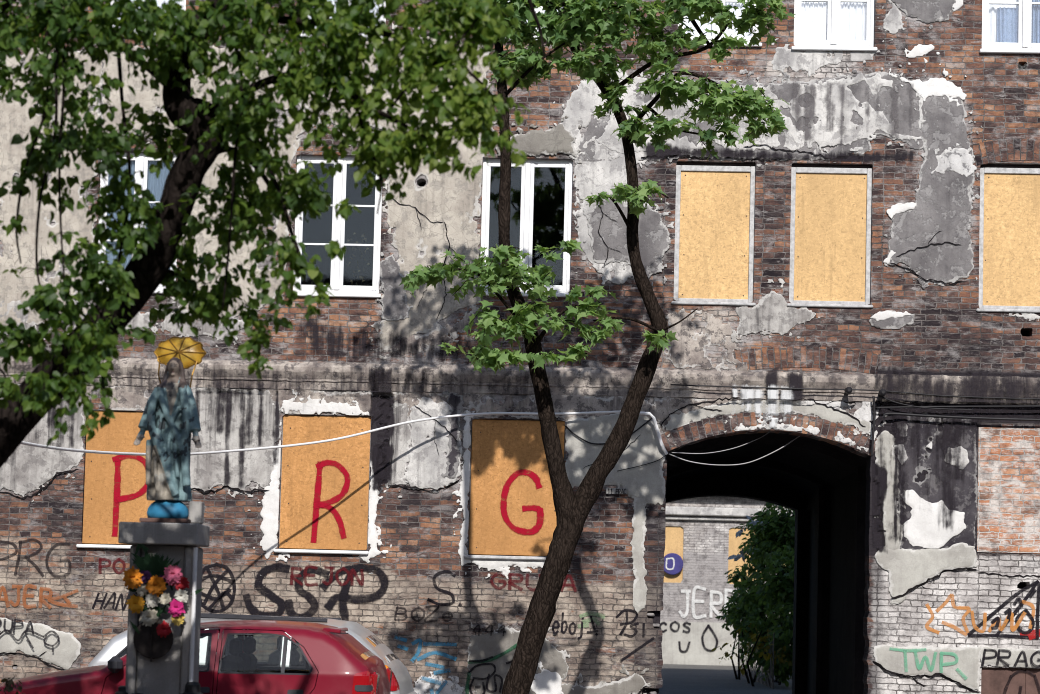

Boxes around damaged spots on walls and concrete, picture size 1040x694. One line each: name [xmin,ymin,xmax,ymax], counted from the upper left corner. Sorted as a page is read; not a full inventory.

peeling [125,0,986,372]
crack [890,231,966,285]
water stain [186,369,300,487]
peeling [190,384,545,580]
peeling [551,395,627,488]
peeling [604,396,978,629]
water stain [872,367,1040,552]
peeling [413,623,520,694]
peeling [529,627,659,694]